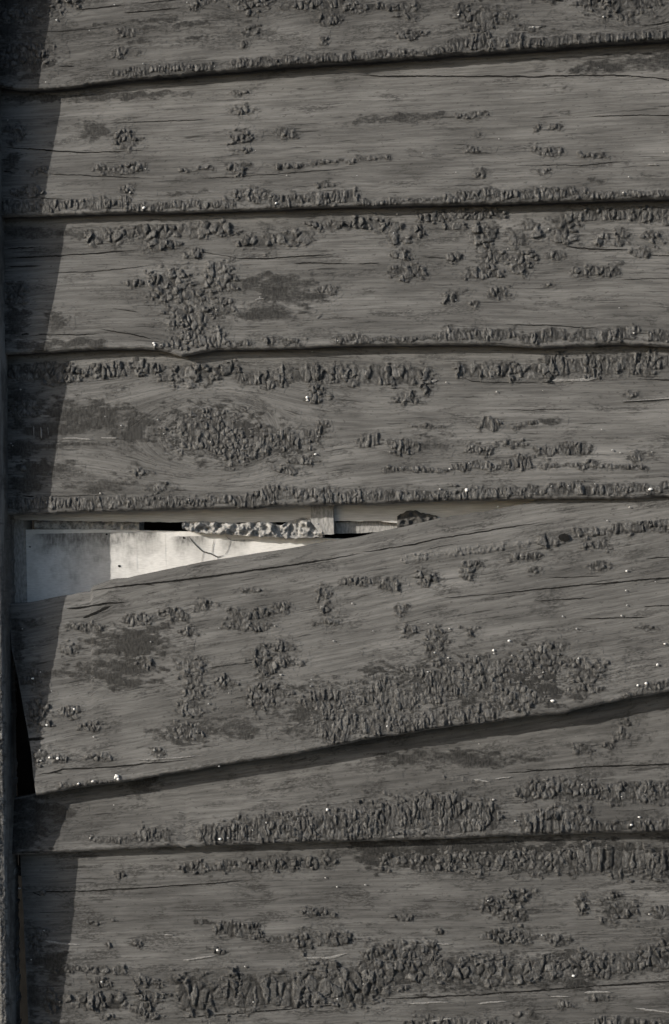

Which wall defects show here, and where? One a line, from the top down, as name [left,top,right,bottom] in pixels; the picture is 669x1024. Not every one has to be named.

crack [370,73,669,81]
crack [67,522,539,618]